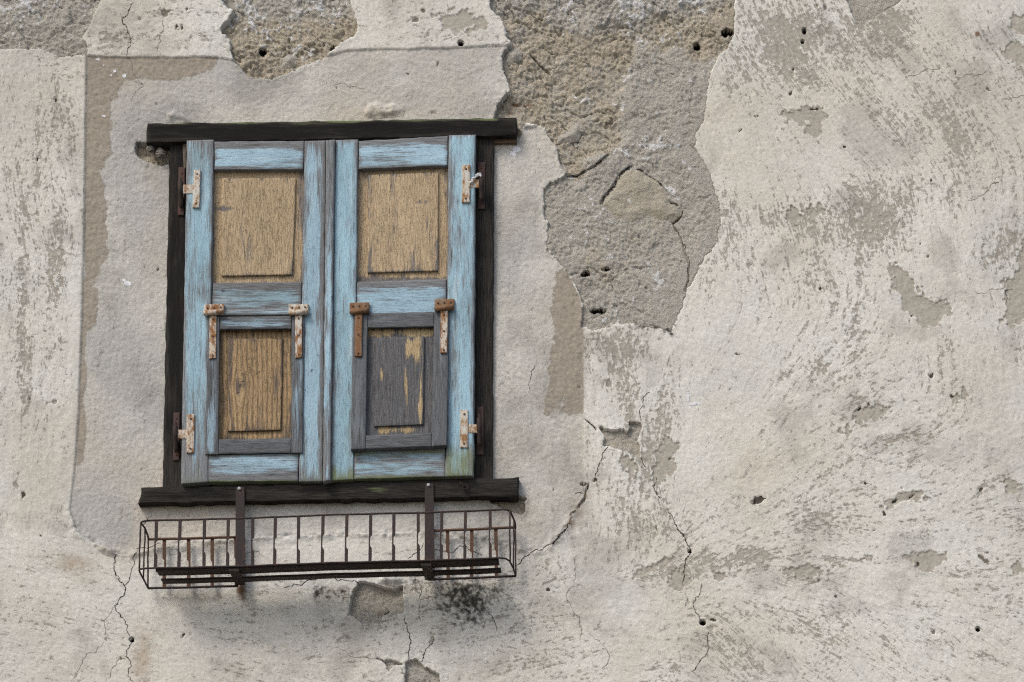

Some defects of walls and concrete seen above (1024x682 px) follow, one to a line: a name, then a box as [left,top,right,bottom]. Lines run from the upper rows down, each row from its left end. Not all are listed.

spalling [222,0,357,80]
flaking render [781,105,829,144]
spalling [412,0,735,332]
flaking render [888,262,956,329]
crack [71,543,158,681]
spalling [350,583,404,624]
leakage [435,580,503,624]
crack [517,420,610,666]
crack [641,458,709,671]